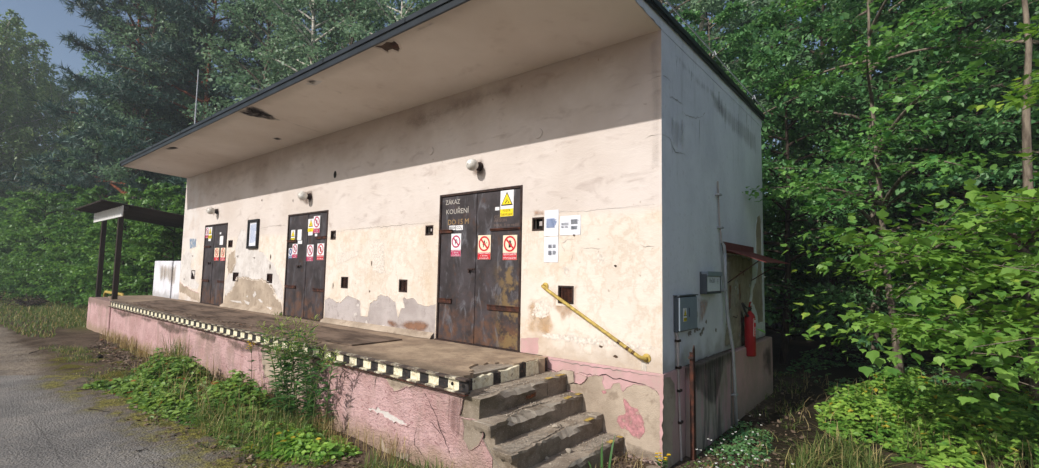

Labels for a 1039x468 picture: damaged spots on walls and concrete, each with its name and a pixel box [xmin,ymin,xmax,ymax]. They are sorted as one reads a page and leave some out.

spalling [374,39,402,53]
peeling [224,228,284,315]
peeling [324,290,436,338]
crack [506,359,659,417]
spalling [502,433,549,453]
peeling [556,369,676,468]